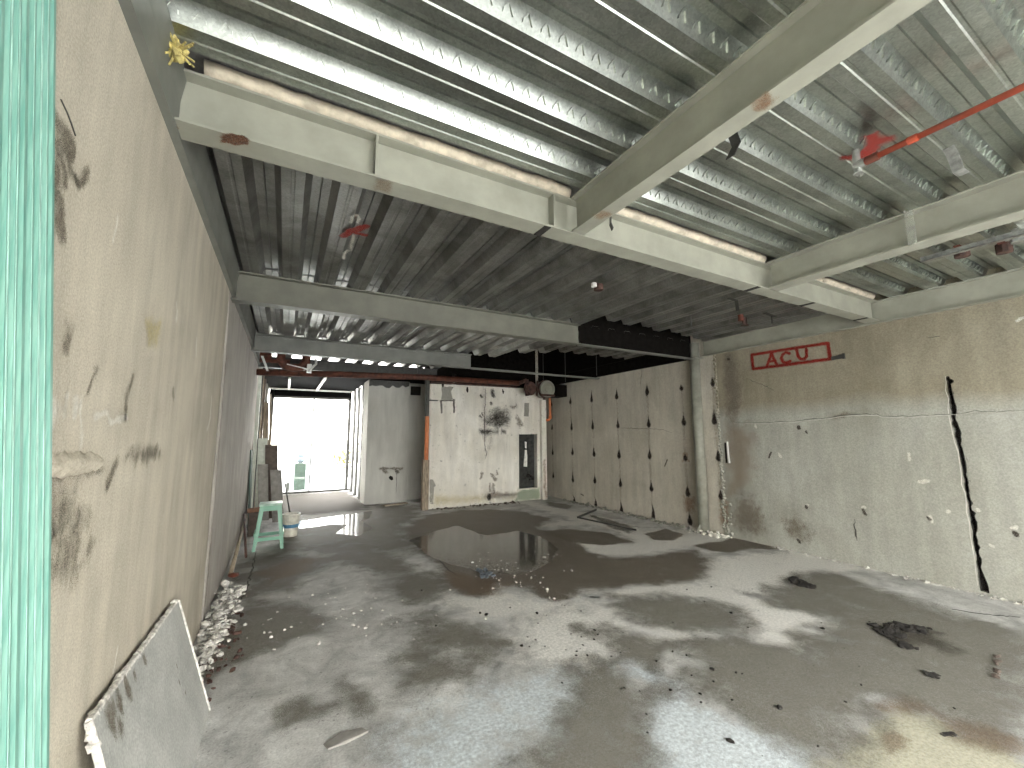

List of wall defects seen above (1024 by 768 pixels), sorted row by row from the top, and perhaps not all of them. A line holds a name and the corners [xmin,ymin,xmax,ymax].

water stain [54,112,91,245]
corrosion [220,132,249,146]
crack [734,410,1024,424]
water stain [51,477,96,593]